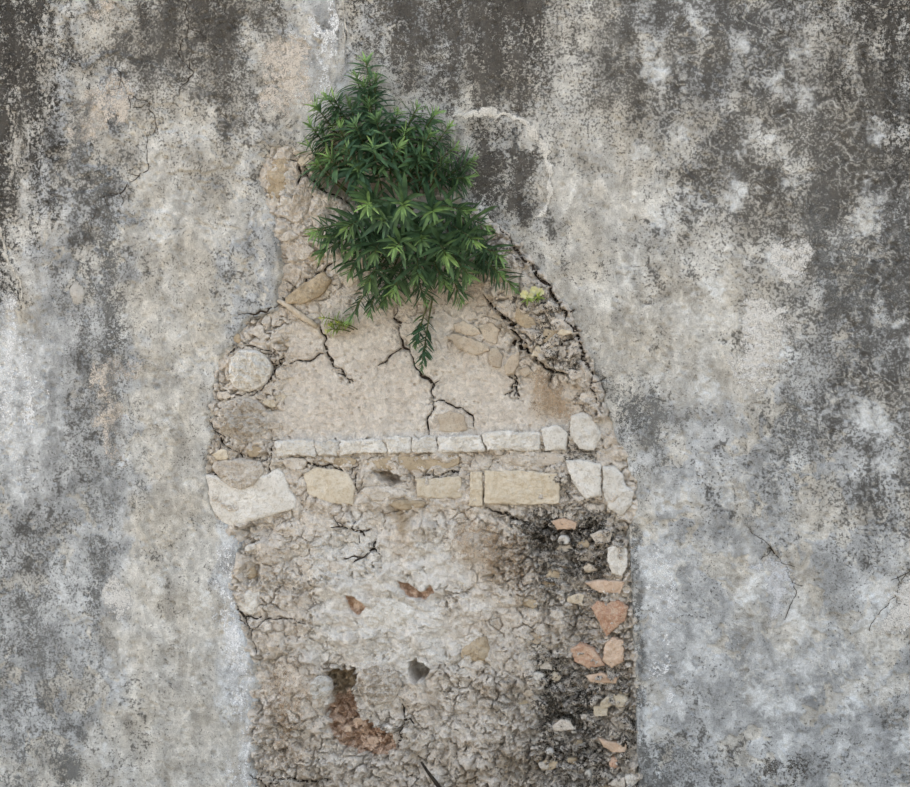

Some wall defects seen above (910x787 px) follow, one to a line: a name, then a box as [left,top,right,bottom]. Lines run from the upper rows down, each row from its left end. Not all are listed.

leakage [0,0,150,787]
spalling [208,316,293,463]
crack [238,263,332,315]
crack [228,326,354,398]
leakage [109,0,577,230]
crack [378,305,474,435]
spalling [260,129,609,423]
crack [485,226,605,403]
leakage [734,0,910,374]
spalling [322,665,401,761]
spalling [493,512,643,787]
leakage [503,434,700,787]